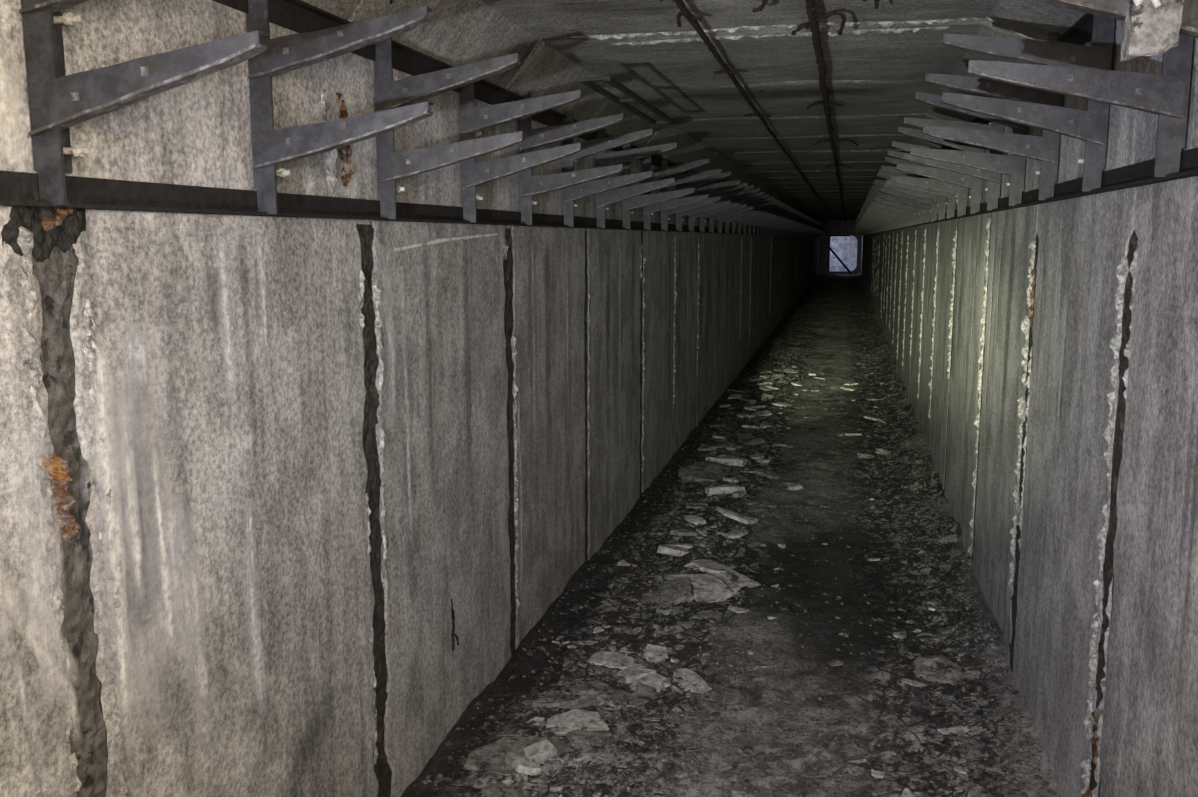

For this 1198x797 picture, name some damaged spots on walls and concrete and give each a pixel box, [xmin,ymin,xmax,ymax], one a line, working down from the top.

spalling [1,190,86,640]
corrosion [40,452,91,546]